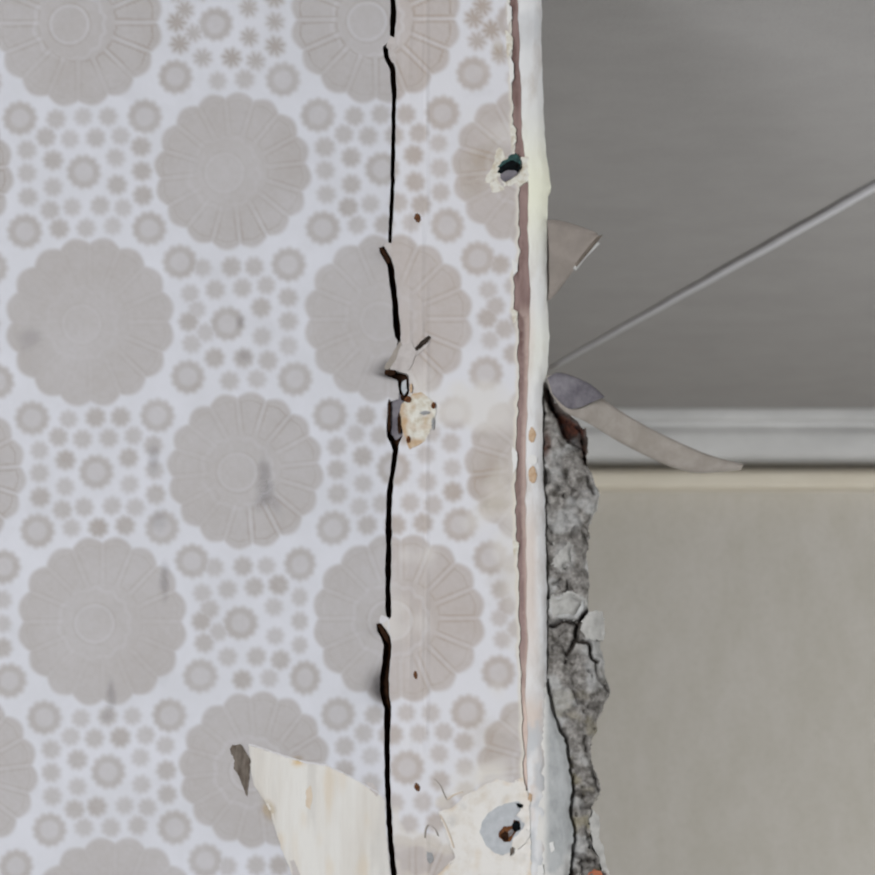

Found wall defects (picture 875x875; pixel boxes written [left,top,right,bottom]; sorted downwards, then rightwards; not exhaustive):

crack [377,0,431,875]
spalling [384,341,436,449]
peeling [505,0,525,157]
spalling [511,182,610,875]